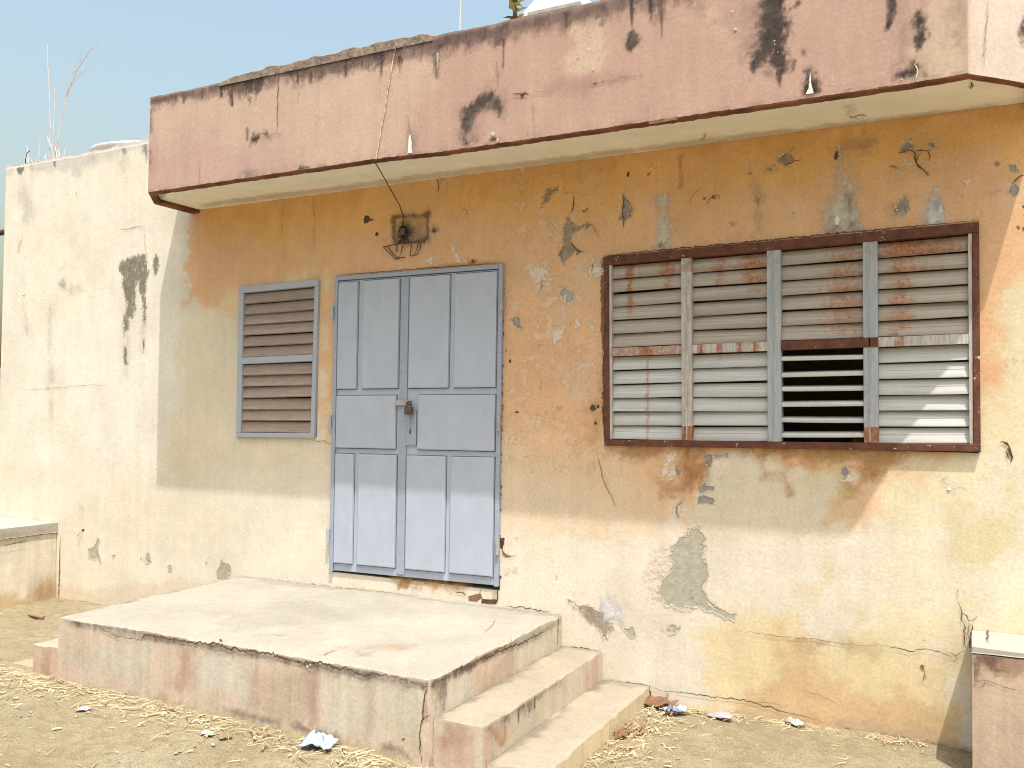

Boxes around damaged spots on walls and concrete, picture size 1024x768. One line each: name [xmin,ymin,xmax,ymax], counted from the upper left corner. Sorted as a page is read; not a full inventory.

damp [154,75,272,106]
damp [288,0,663,145]
damp [751,0,820,94]
peeling [888,137,950,179]
peeling [618,192,633,227]
peeling [510,185,605,440]
peeling [76,529,115,565]
peeling [641,499,738,637]
peeling [565,598,637,639]
crack [741,589,990,662]
crack [99,606,600,763]